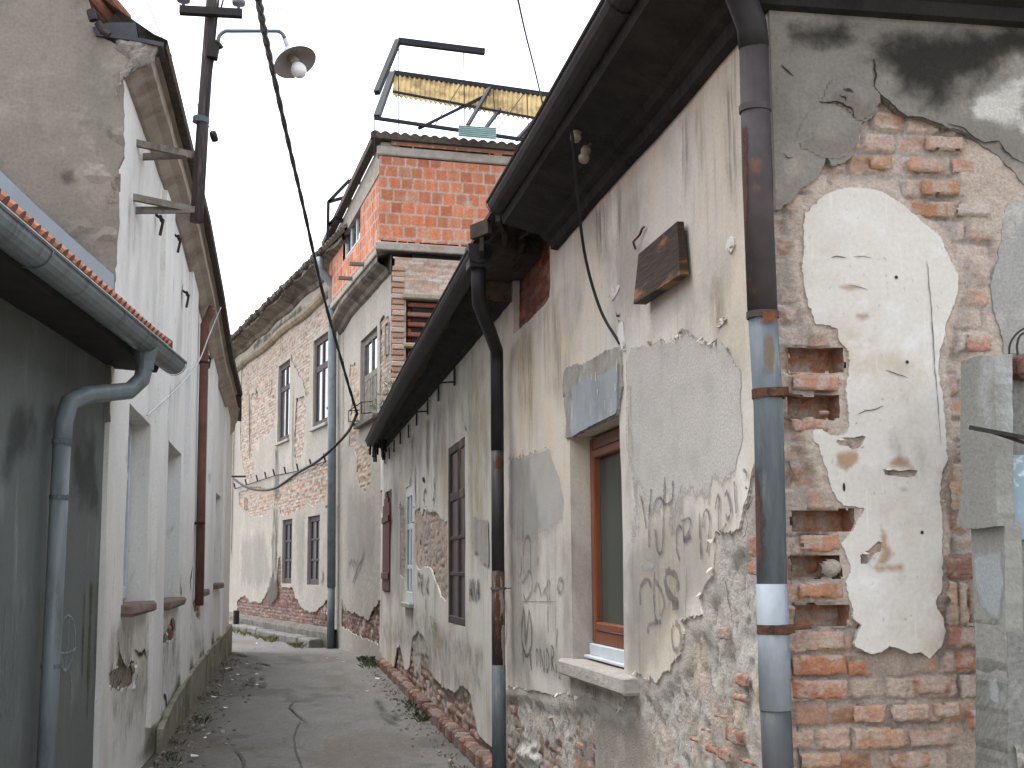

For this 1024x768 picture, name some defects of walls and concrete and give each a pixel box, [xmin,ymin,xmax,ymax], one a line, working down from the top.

spalling [115,39,155,97]
crack [873,60,1024,163]
damp [973,78,1024,132]
flaking render [773,100,1024,768]
flaking render [237,558,327,627]
flaking render [342,600,380,644]
flaking render [397,503,448,601]
rust [494,569,505,672]
flaking render [506,475,762,768]
flaking render [109,658,139,695]
flaking render [395,631,492,753]